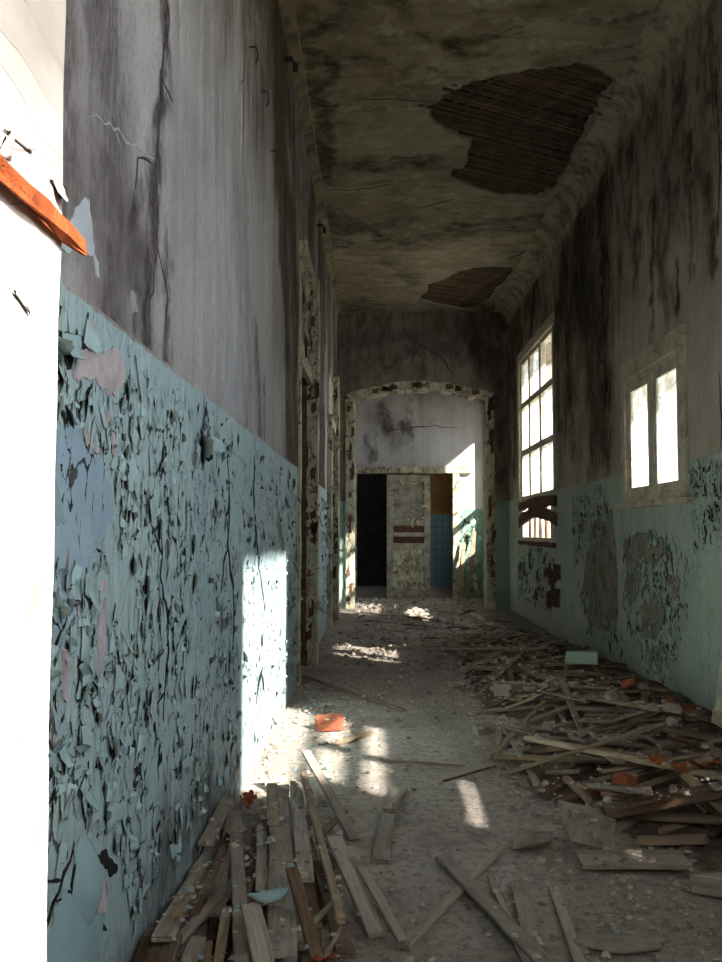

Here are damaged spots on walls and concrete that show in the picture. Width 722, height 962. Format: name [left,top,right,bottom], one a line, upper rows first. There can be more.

water stain [65,0,75,105]
peeling [0,128,32,161]
water stain [62,125,79,217]
peeling [50,179,100,278]
crack [79,5,173,346]
water stain [93,0,174,347]
water stain [270,0,299,467]
spalling [417,61,616,197]
peeling [47,271,355,936]
peeling [459,494,496,595]
peeling [516,546,561,614]
peeling [571,458,722,685]